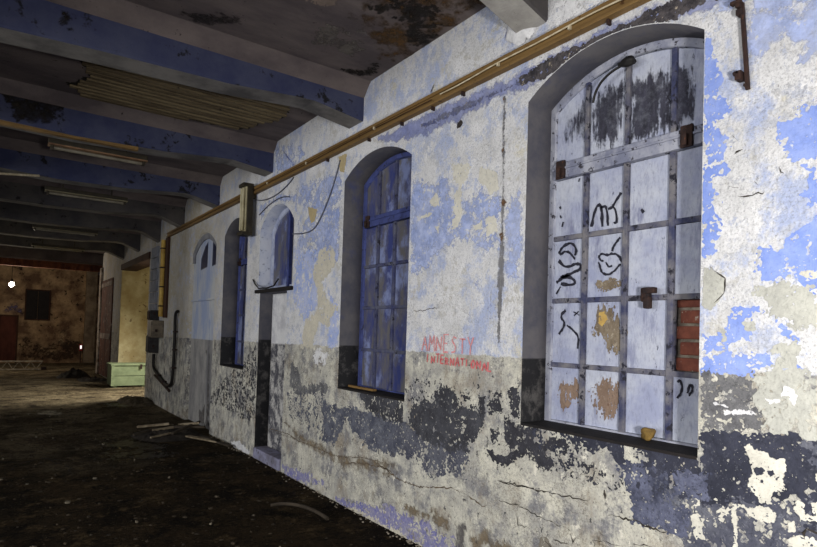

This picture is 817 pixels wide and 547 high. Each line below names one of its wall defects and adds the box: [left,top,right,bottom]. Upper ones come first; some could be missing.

damp [312,0,483,76]
damp [378,6,659,175]
damp [678,0,718,16]
peeling [702,38,734,258]
peeling [260,154,347,365]
peeling [282,99,817,547]
damp [288,426,393,476]
crack [266,422,669,547]